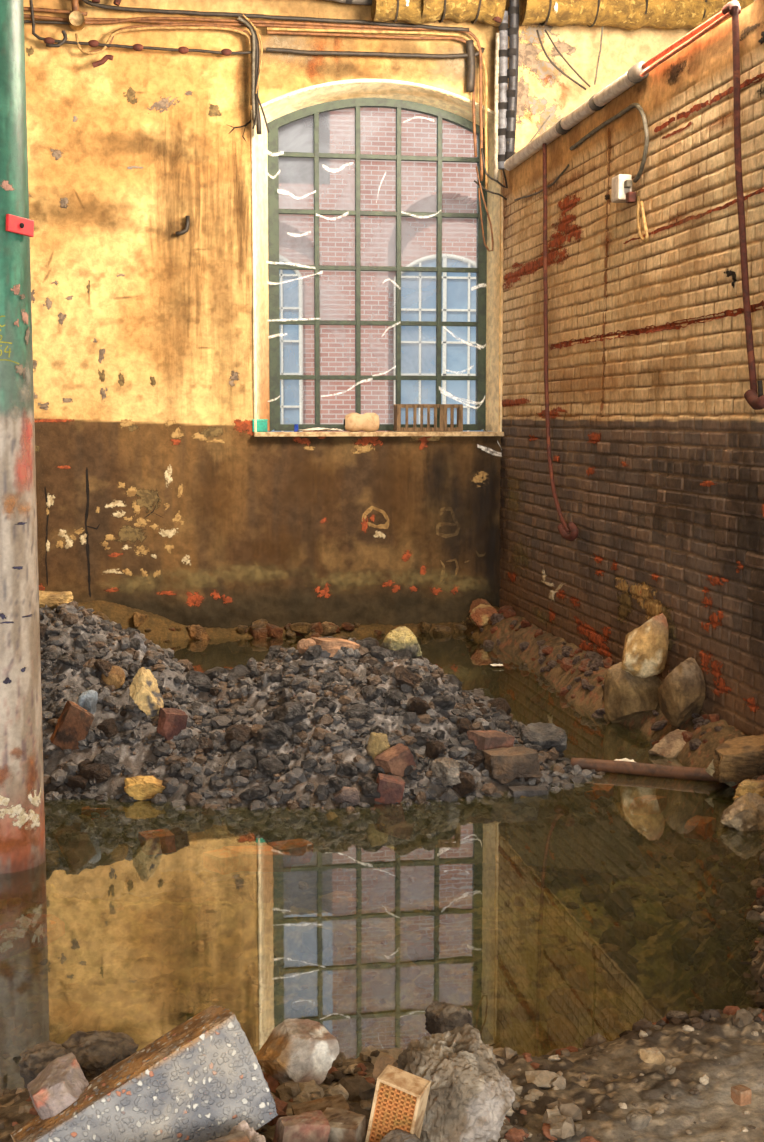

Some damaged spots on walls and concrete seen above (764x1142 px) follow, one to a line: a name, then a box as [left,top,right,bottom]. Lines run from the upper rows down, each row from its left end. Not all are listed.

peeling [123,87,193,114]
peeling [208,104,223,117]
peeling [503,189,583,290]
rust [550,128,764,417]
peeling [93,338,125,402]
peeling [46,528,87,551]
peeling [96,464,192,593]
peeling [157,590,233,607]
leakage [541,569,563,601]